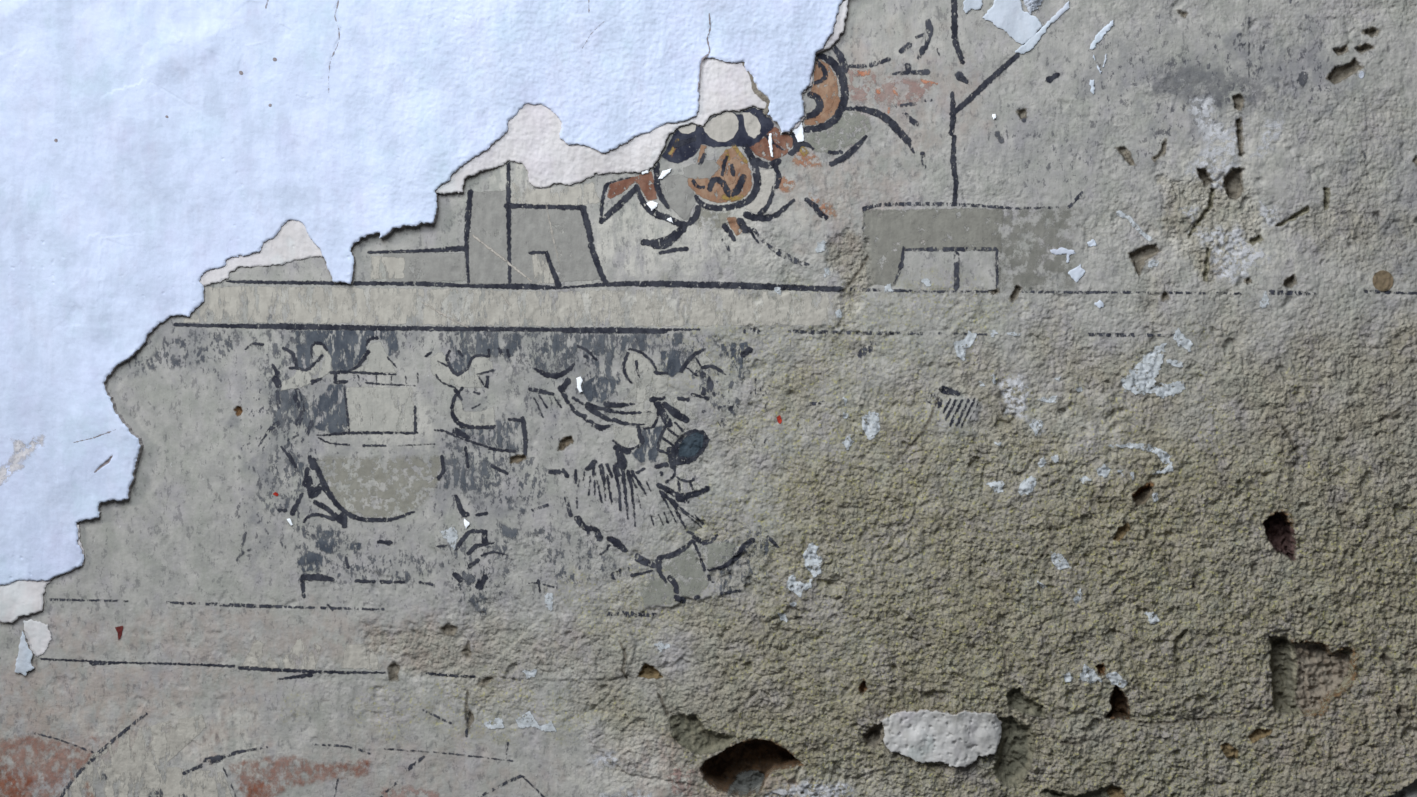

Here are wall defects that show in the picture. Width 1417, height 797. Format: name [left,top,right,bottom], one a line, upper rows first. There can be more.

flaking render [963,0,1069,54]
spalling [1117,147,1135,165]
spalling [991,285,1021,302]
flaking render [0,0,848,681]
peeling [953,330,1022,361]
peeling [842,397,880,450]
peeling [986,454,1059,495]